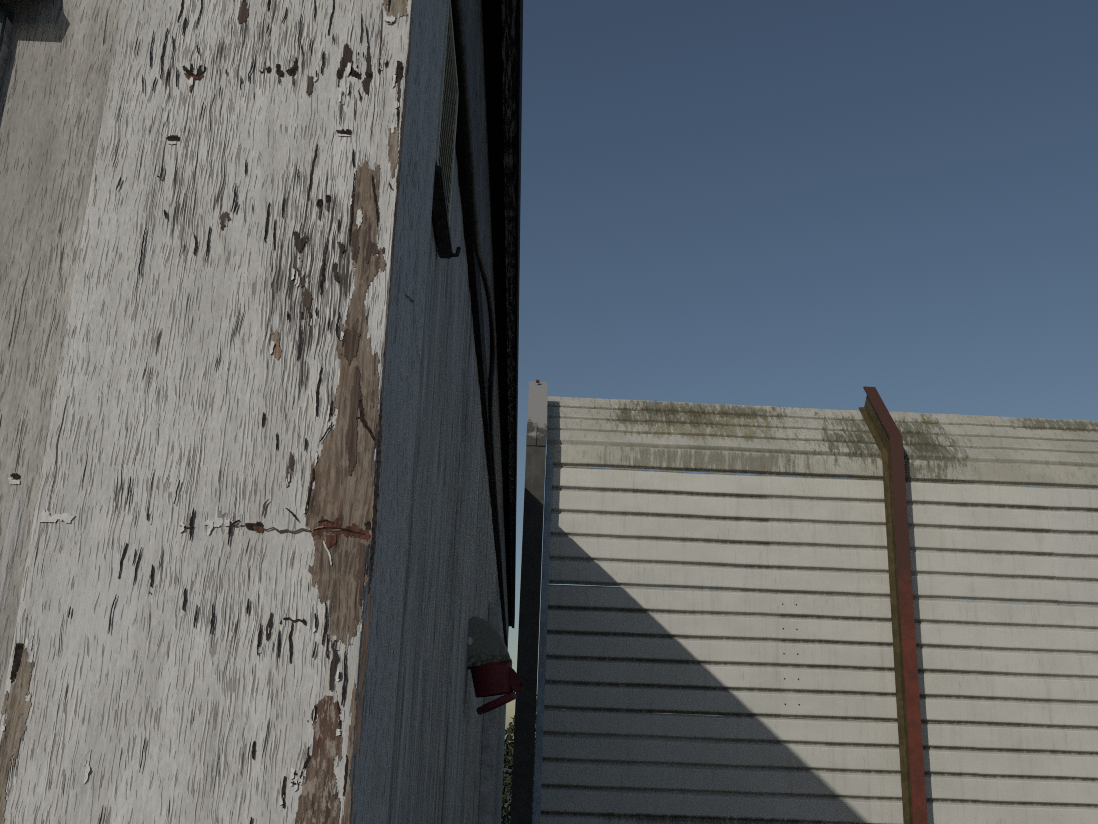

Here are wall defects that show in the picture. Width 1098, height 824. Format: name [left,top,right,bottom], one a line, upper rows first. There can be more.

crack [134,0,202,94]
peeling [238,0,249,24]
peeling [240,51,325,96]
crack [266,0,335,55]
crack [360,10,382,58]
peeling [382,0,407,24]
crack [193,160,247,261]
crack [226,144,345,545]
peeling [257,58,400,824]
crack [108,543,154,634]
crack [182,588,214,634]
peeling [0,635,34,824]